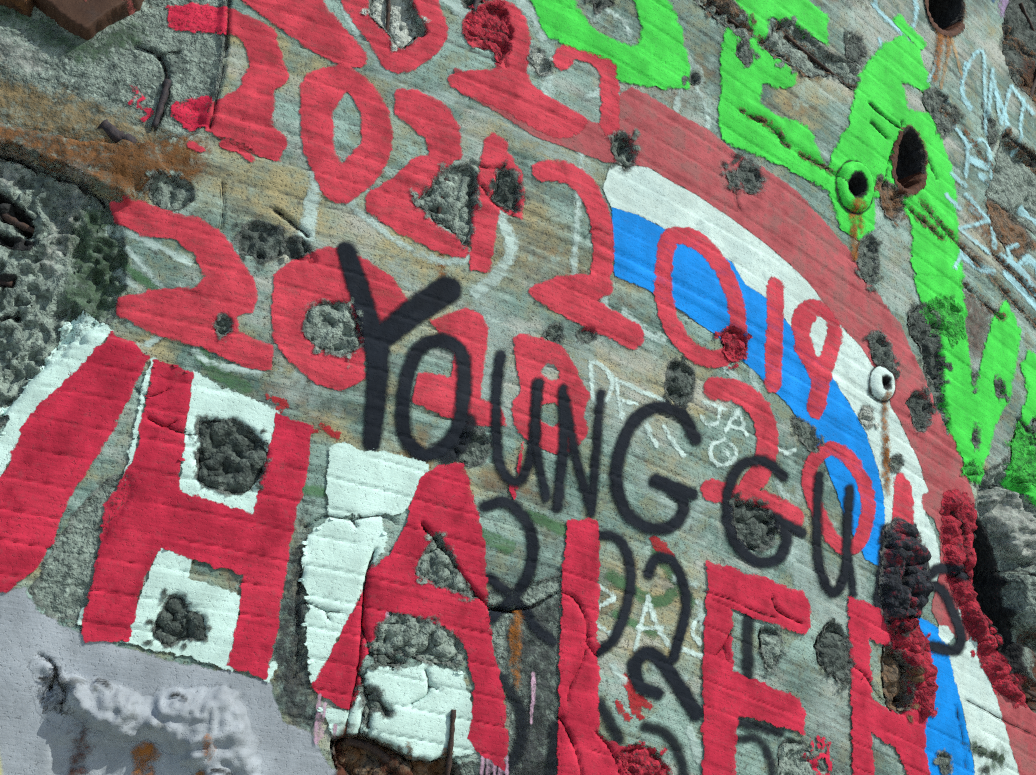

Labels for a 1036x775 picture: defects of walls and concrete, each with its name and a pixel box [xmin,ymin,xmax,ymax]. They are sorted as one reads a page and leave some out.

spalling [362,0,430,51]
rust [933,33,951,82]
rust [0,81,211,201]
spalling [0,0,229,437]
spalling [410,159,530,252]
rust [849,197,865,260]
spalling [178,416,270,496]
rust [882,392,891,494]
spalling [878,420,1036,723]
spalling [143,588,212,650]
spalling [329,532,563,775]
crack [983,613,1016,685]